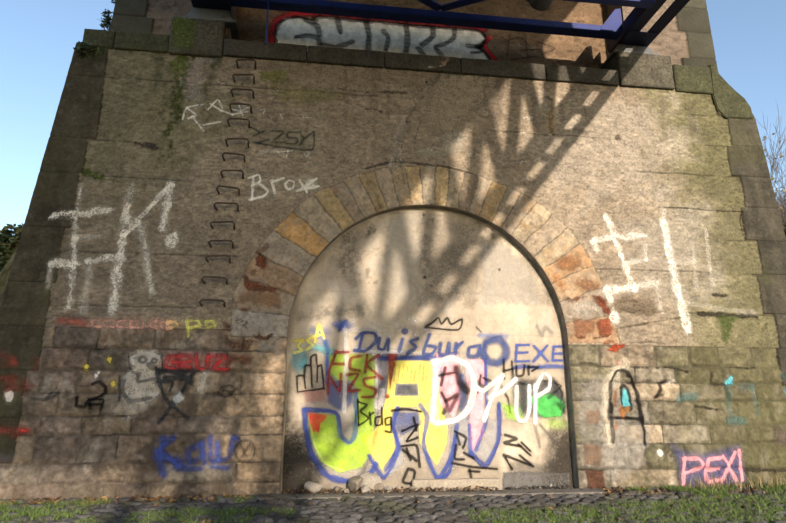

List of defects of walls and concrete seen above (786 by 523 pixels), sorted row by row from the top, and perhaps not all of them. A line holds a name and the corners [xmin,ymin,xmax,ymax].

crack [353,56,470,173]